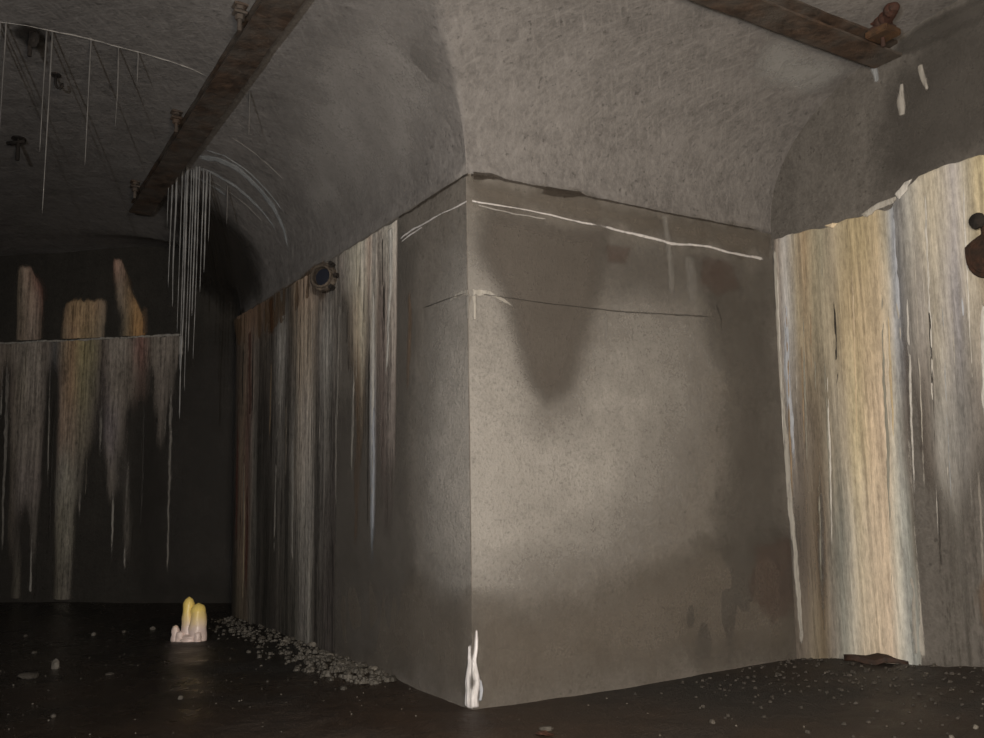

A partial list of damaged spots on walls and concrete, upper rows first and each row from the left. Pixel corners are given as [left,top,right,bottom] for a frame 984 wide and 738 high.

water stain [189,151,287,243]
water stain [285,4,440,222]
crack [399,172,763,260]
water stain [422,0,984,667]
water stain [0,200,483,708]